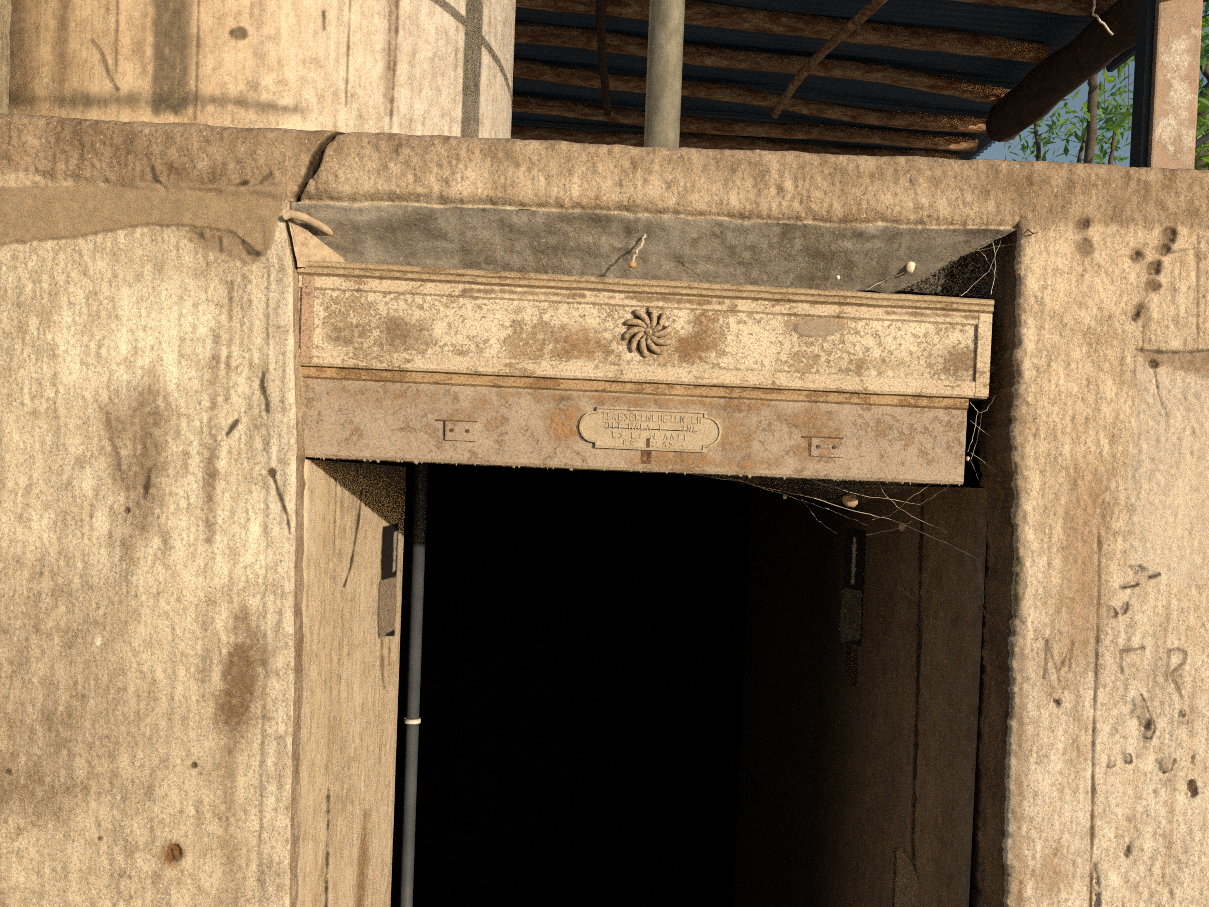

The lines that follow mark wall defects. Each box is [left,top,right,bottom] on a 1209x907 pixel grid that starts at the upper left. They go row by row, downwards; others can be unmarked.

damp [154,0,199,113]
crack [296,132,345,203]
rust [464,288,586,298]
rust [555,329,600,359]
rust [626,295,724,359]
rust [886,310,980,319]
damp [221,639,261,725]